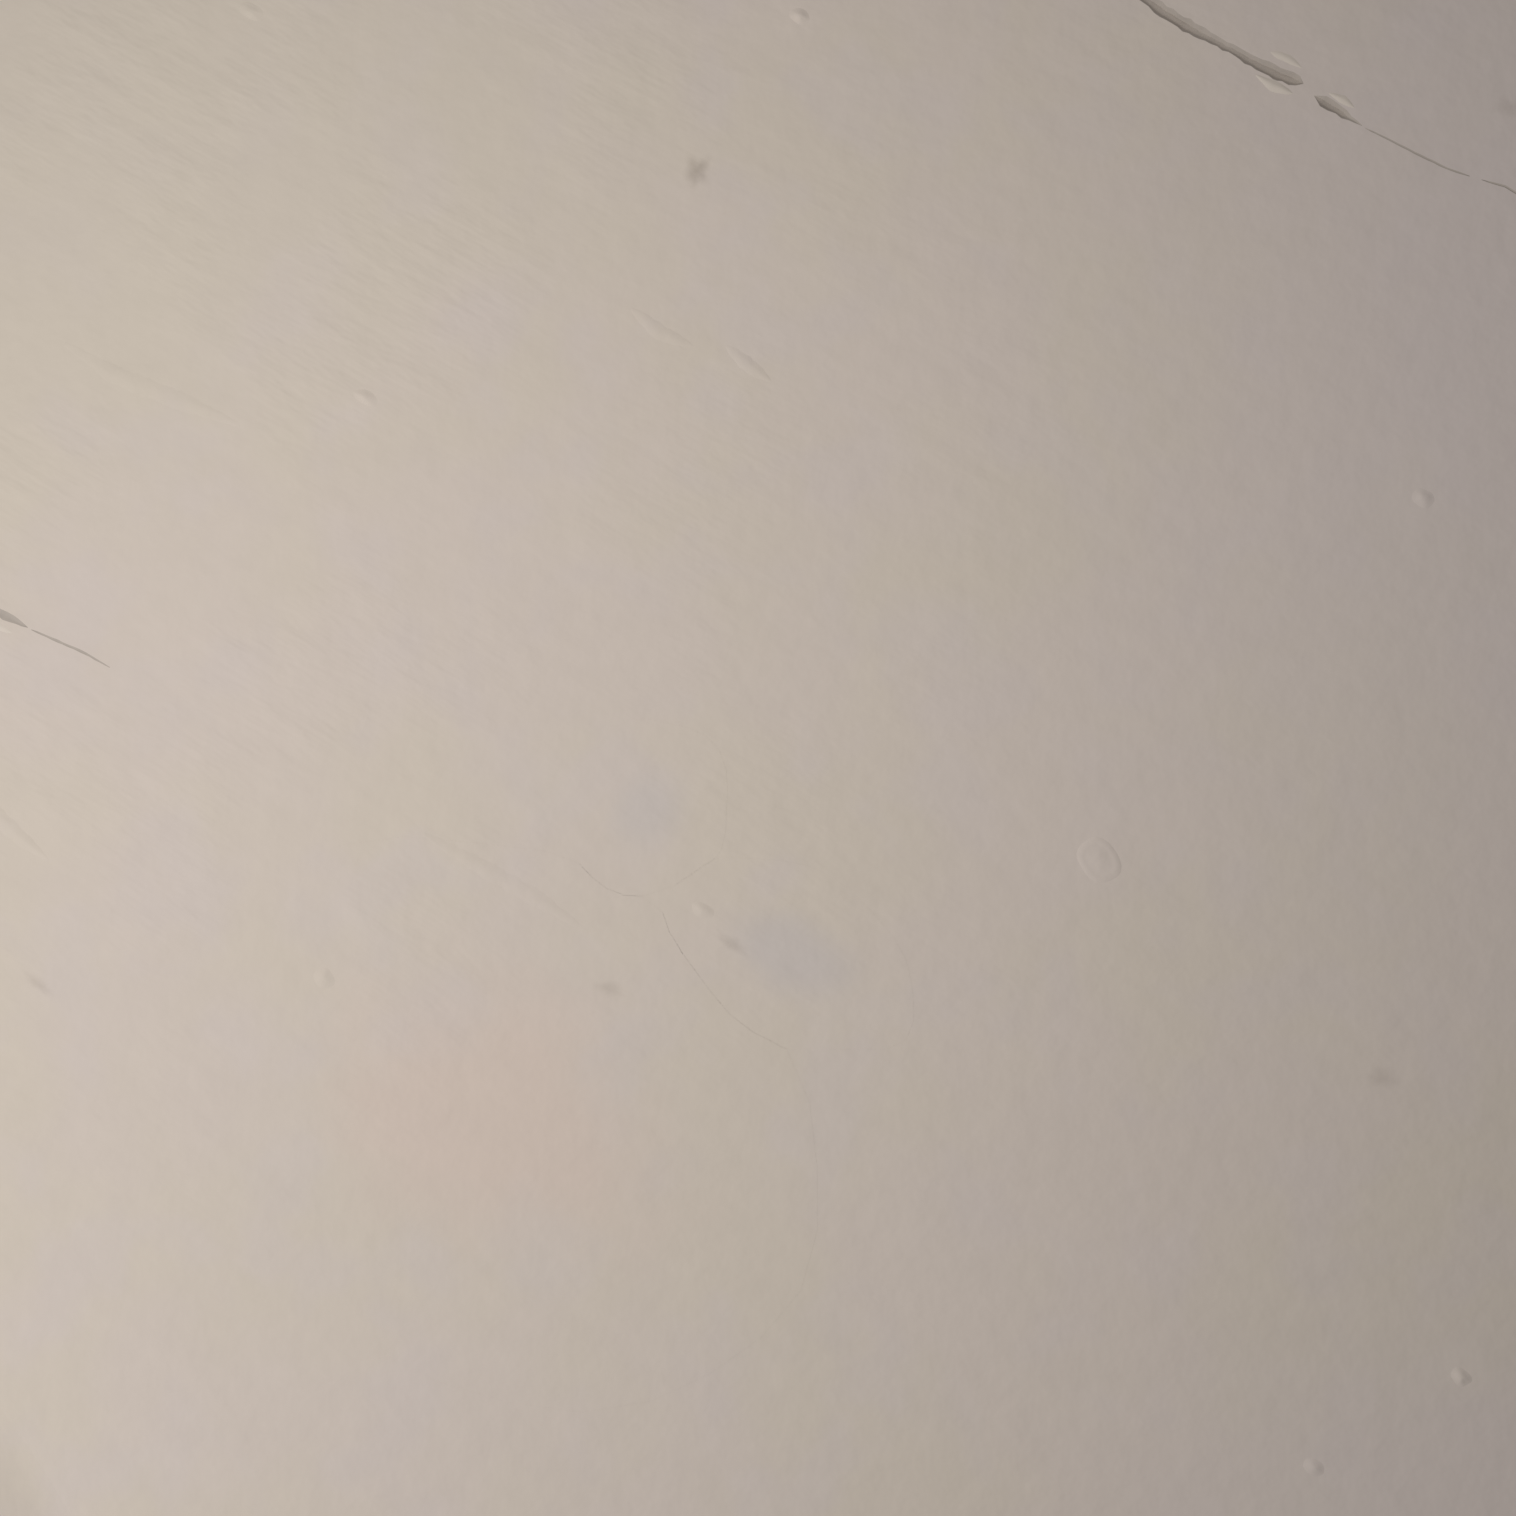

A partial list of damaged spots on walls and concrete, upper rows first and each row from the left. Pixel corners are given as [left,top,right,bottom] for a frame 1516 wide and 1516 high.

crack [1140,0,1516,194]